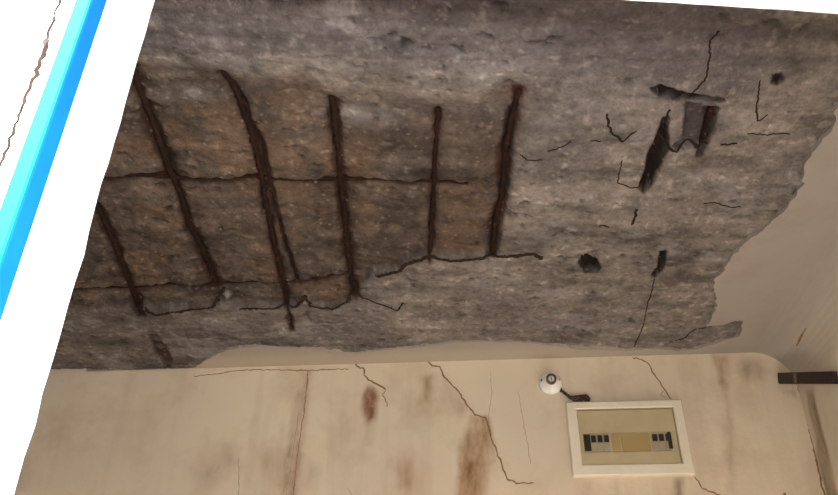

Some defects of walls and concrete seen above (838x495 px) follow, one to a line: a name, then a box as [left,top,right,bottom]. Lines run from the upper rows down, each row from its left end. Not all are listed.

crack [692,30,720,94]
flaking render [50,0,838,370]
crack [520,114,640,189]
crack [657,80,790,153]
crack [632,277,672,400]
crack [194,364,388,495]
rust [365,390,376,418]
crack [428,362,534,484]
crack [807,424,826,495]